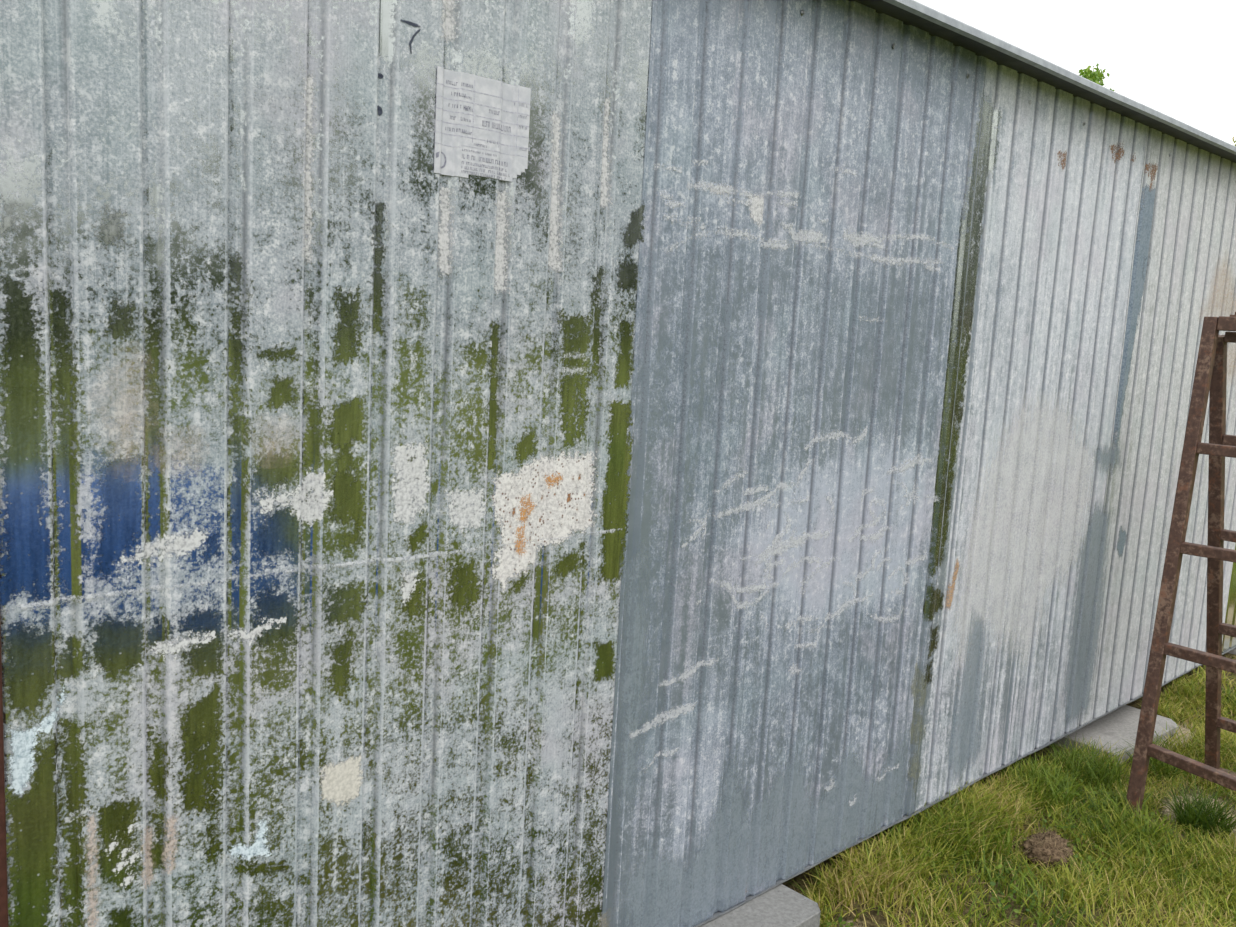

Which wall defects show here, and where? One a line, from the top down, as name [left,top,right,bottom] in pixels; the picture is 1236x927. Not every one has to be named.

water stain [548,111,562,271]
corrosion [1111,143,1158,189]
water stain [257,467,333,529]
water stain [390,440,600,592]
corrosion [512,471,585,555]
water stain [113,527,208,579]
water stain [400,569,420,603]
water stain [151,617,287,661]
water stain [4,686,70,794]
water stain [320,755,363,806]
water stain [104,818,142,886]
water stain [228,819,272,861]